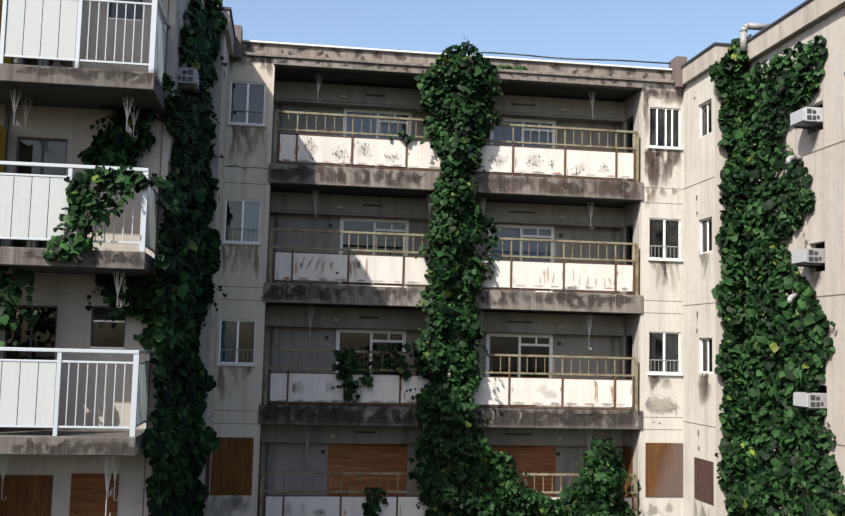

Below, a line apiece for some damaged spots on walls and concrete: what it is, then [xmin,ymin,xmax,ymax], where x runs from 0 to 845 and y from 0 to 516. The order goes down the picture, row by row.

water stain [231,42,271,68]
water stain [259,402,414,423]
water stain [476,405,636,425]